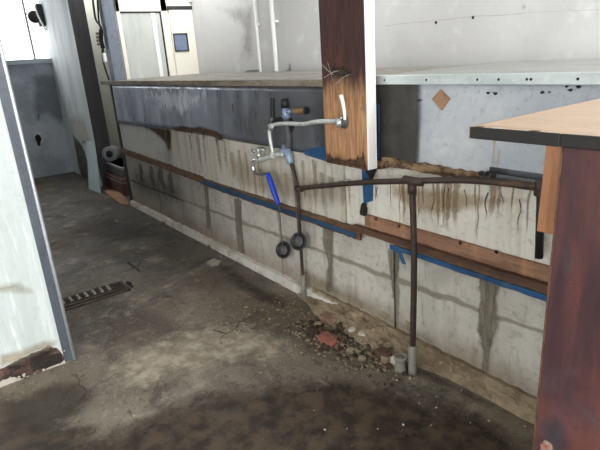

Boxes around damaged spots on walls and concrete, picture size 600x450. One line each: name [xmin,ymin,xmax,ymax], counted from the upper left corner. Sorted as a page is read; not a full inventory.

rust [146,127,223,151]
leakage [479,279,496,342]
spalling [0,348,69,387]